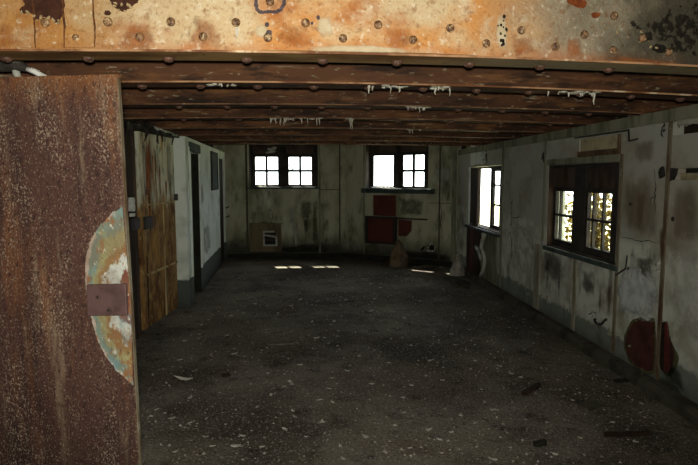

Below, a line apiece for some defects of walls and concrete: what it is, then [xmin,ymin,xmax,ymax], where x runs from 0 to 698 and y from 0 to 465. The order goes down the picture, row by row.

peeling [19,0,65,24]
peeling [104,0,138,15]
corrosion [567,0,587,8]
efflorescence [558,91,601,104]
spalling [624,317,679,376]